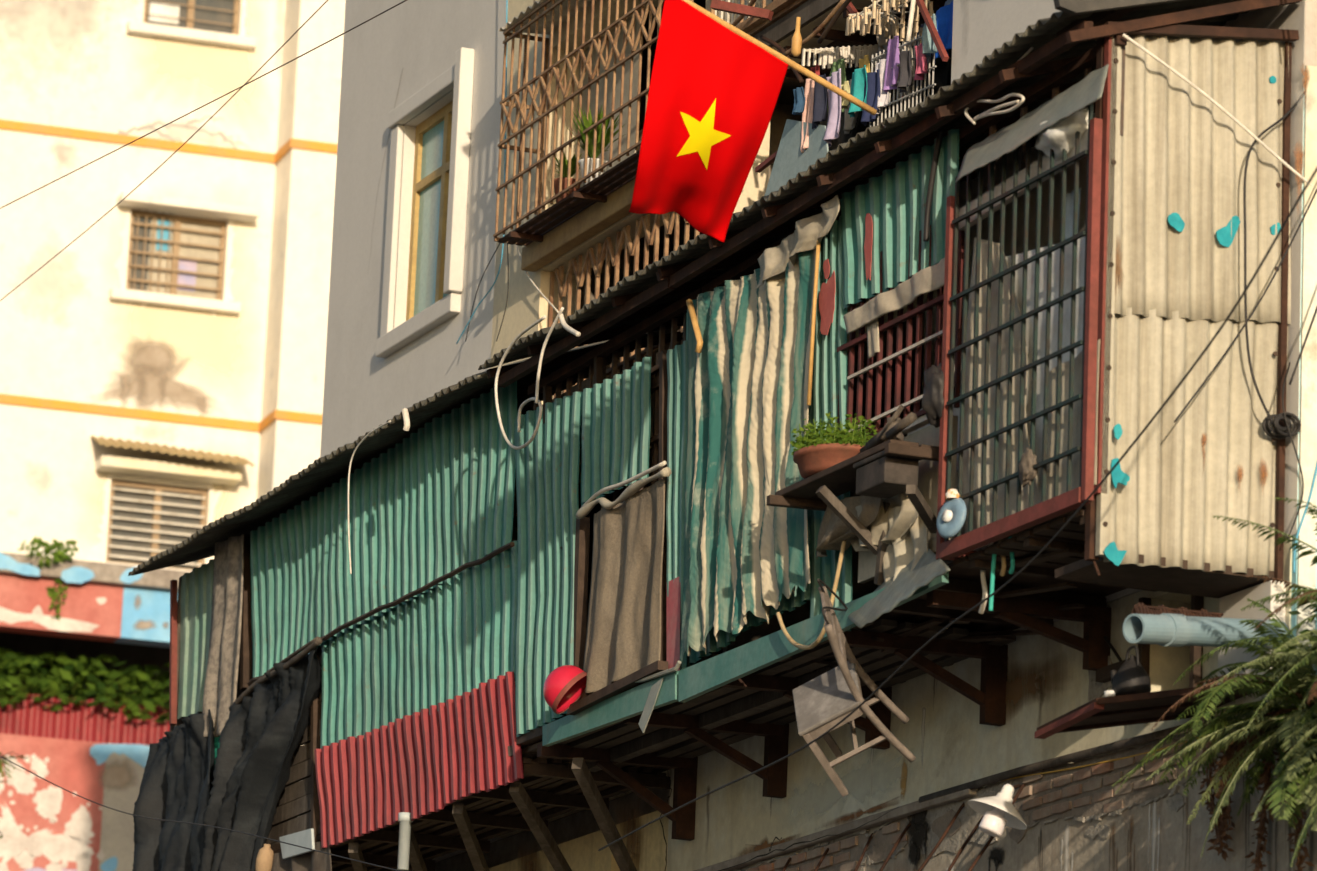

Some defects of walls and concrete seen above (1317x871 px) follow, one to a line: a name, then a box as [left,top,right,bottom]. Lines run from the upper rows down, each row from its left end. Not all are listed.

crack [118,116,251,149]
leakage [111,344,207,410]
peeling [0,606,100,632]
peeling [90,744,149,768]
peeling [0,754,118,871]
flaking render [733,731,1224,871]
leakage [908,810,930,871]
leakage [988,848,1004,871]
leakage [1061,829,1073,871]